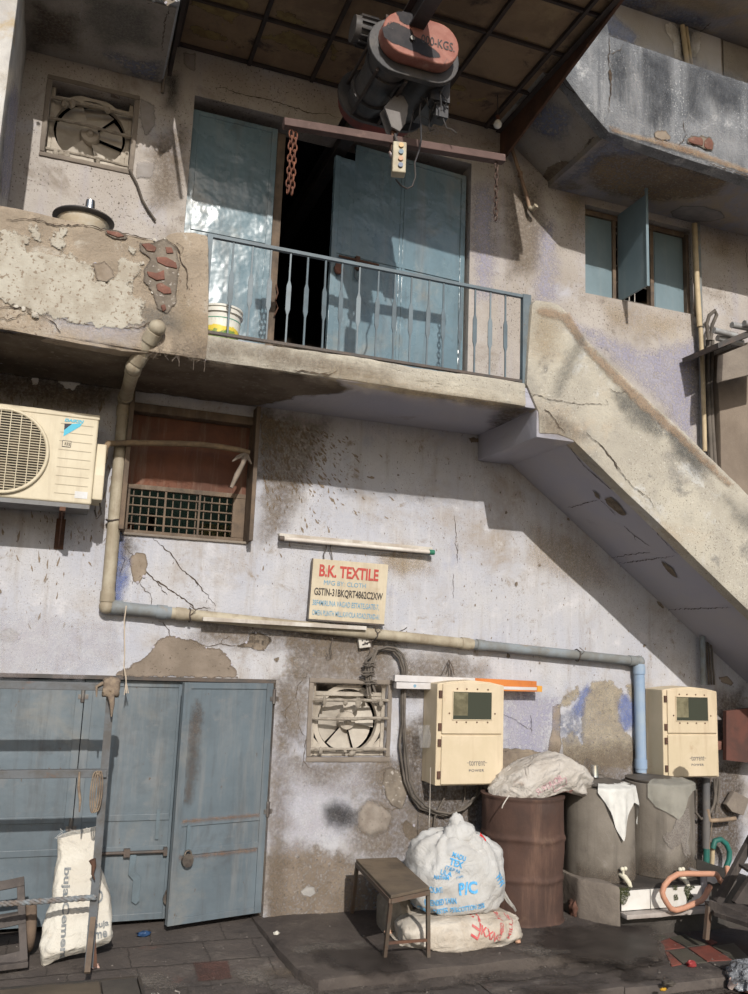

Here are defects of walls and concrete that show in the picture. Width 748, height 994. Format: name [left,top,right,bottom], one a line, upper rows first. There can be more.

peeling [0,223,180,330]
leakage [0,331,397,558]
crack [520,388,676,564]
crack [120,538,216,635]
peeling [116,632,272,679]
peeling [548,704,562,753]